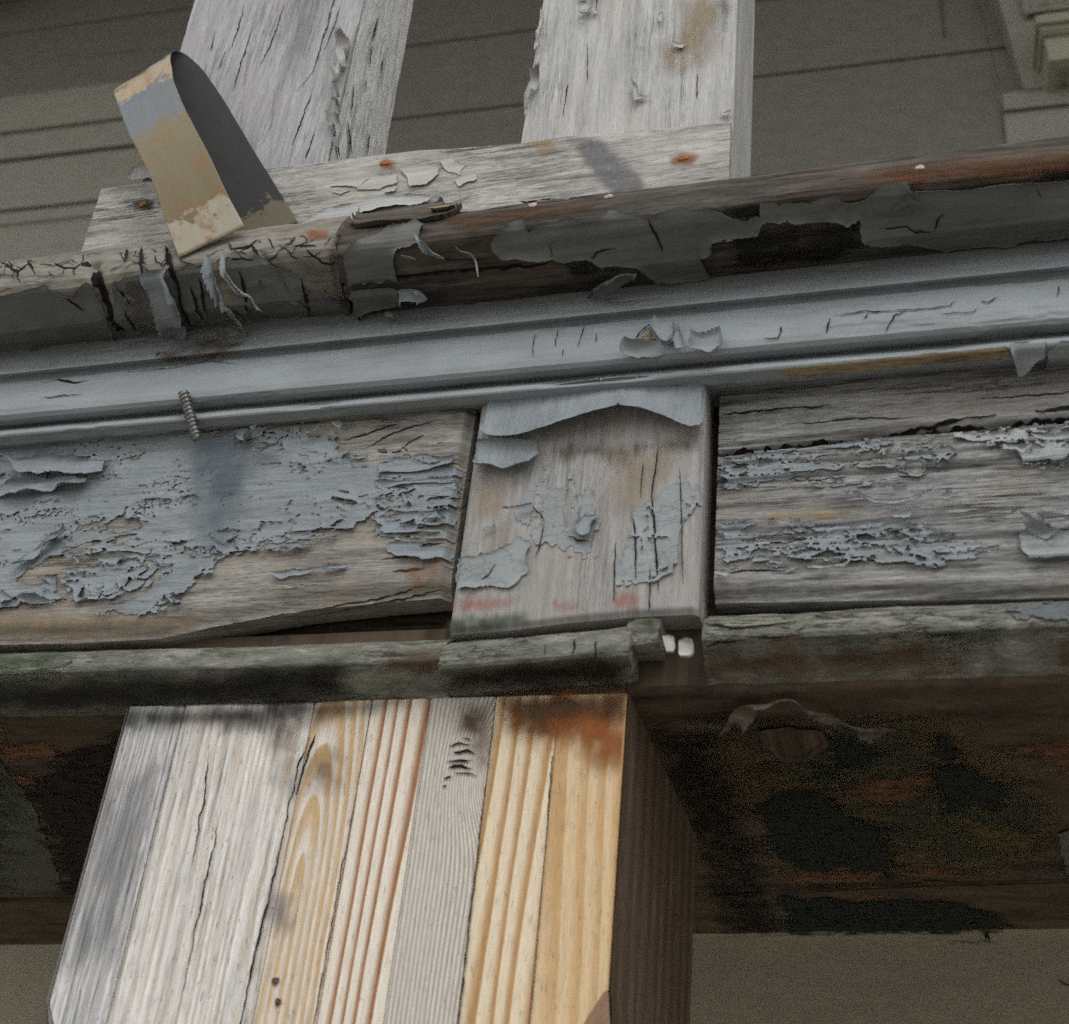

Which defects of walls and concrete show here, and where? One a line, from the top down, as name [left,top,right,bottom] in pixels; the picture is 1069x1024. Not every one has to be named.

crack [0,235,370,332]
peeling [0,157,477,352]
crack [396,247,552,278]
crack [470,196,594,207]
peeling [619,315,722,358]
peeling [490,180,1069,299]
peeling [1009,339,1069,378]
peeling [0,375,706,617]
peeling [714,421,1069,576]
crack [175,753,221,1024]
crack [239,733,316,1024]